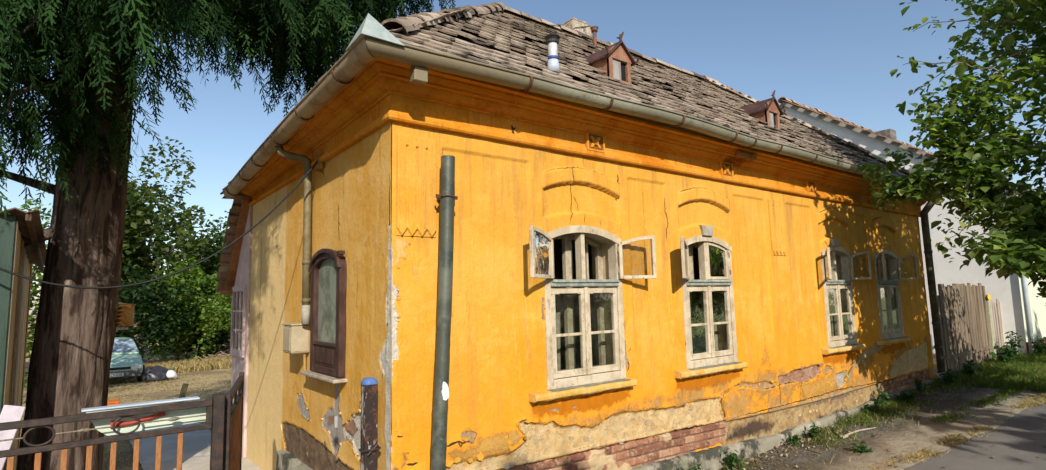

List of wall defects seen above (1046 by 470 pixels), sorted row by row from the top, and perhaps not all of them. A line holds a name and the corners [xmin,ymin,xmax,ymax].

crack [546,157,619,223]
crack [642,187,729,248]
spalling [380,175,417,470]
spalling [282,383,361,470]
spalling [446,338,931,470]